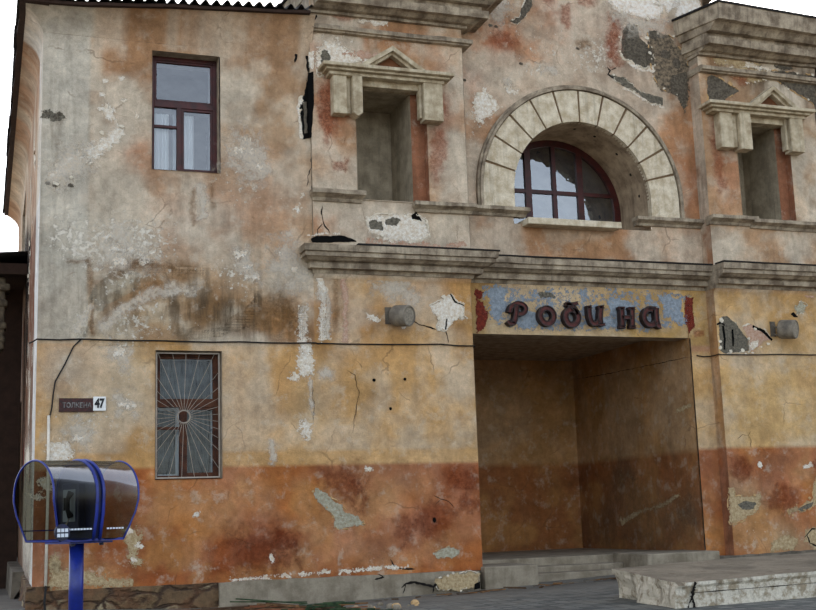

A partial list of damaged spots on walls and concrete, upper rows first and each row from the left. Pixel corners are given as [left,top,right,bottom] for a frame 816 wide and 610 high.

spalling [606,0,701,113]
spalling [296,39,378,139]
peeling [471,85,503,126]
peeling [33,76,127,194]
spalling [307,232,356,243]
spalling [365,211,467,248]
peeling [429,294,468,332]
peeling [474,286,538,331]
spalling [717,316,773,356]
spalling [727,487,761,525]
spalling [435,569,481,592]
crack [688,581,810,608]